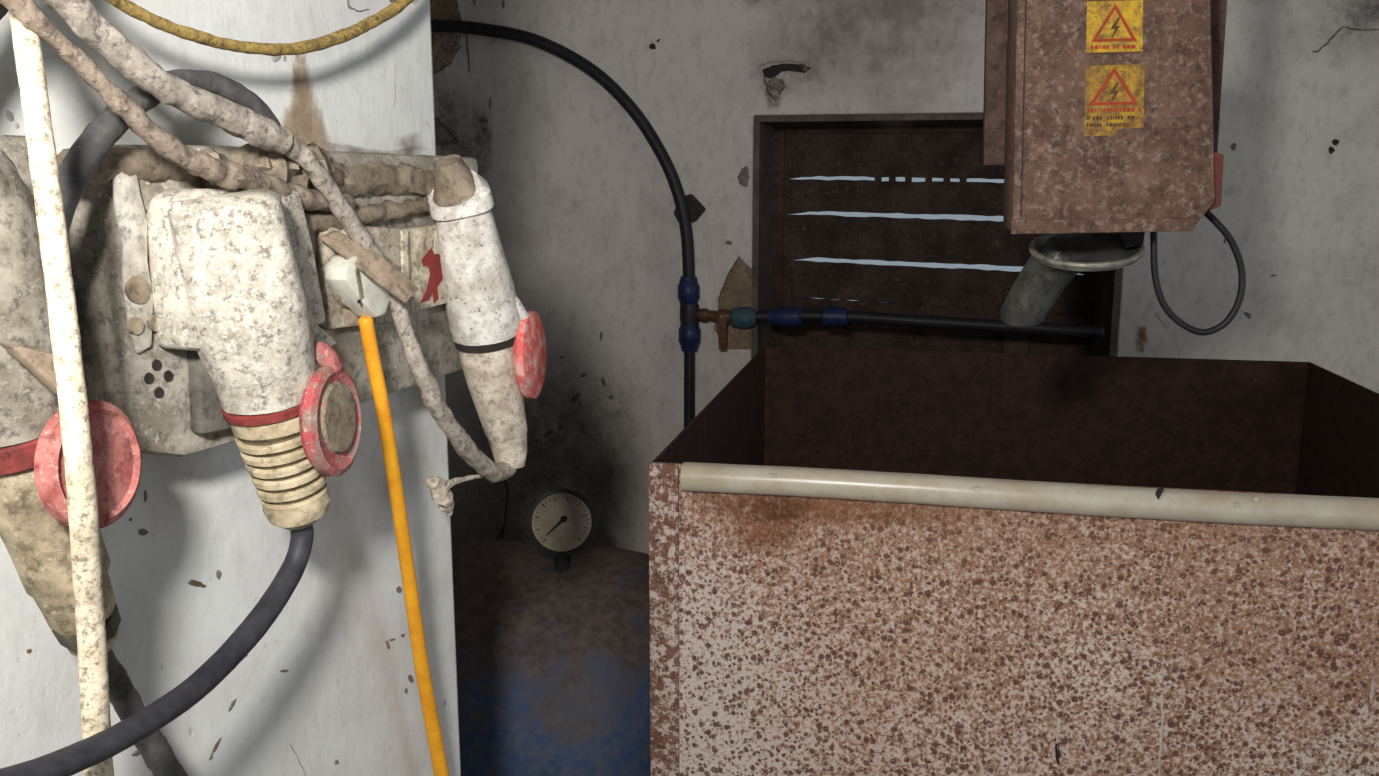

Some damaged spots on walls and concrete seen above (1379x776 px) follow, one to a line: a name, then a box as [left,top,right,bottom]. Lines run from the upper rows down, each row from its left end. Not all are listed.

crack [347,0,370,12]
spalling [412,0,475,74]
spalling [714,240,752,350]